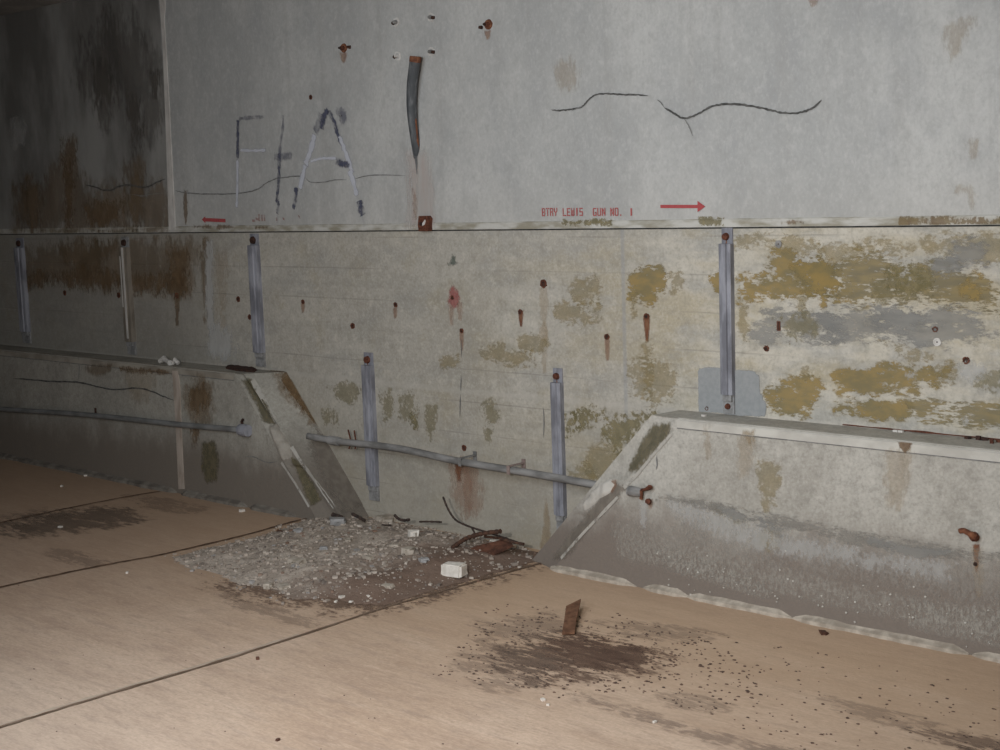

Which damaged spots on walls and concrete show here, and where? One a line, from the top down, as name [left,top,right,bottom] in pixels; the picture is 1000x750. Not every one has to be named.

crack [552,93,821,136]
crack [15,358,173,400]